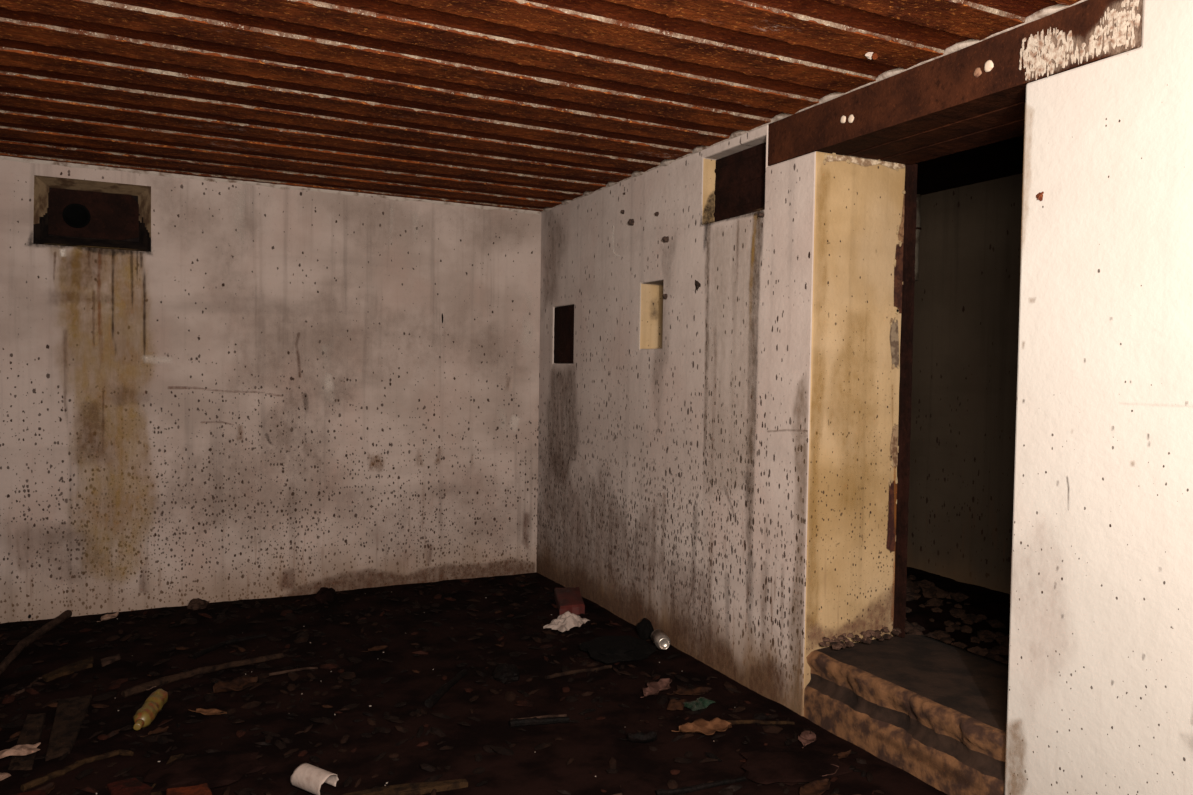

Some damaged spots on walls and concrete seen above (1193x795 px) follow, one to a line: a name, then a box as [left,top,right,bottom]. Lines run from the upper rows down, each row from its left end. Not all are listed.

leakage [284,554,782,700]